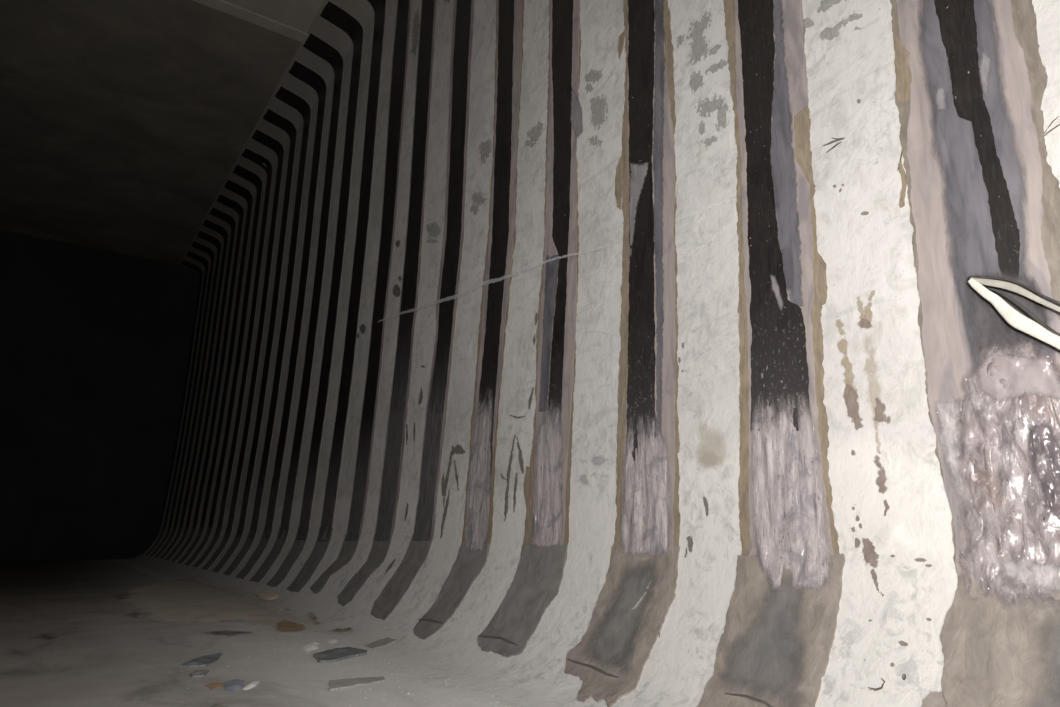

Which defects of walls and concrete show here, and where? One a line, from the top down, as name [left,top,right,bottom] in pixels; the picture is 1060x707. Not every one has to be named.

spalling [803,0,862,40]
spalling [524,121,543,147]
spalling [585,69,608,147]
corrosion [857,291,874,328]
corrosion [837,320,891,516]
corrosion [851,507,883,596]